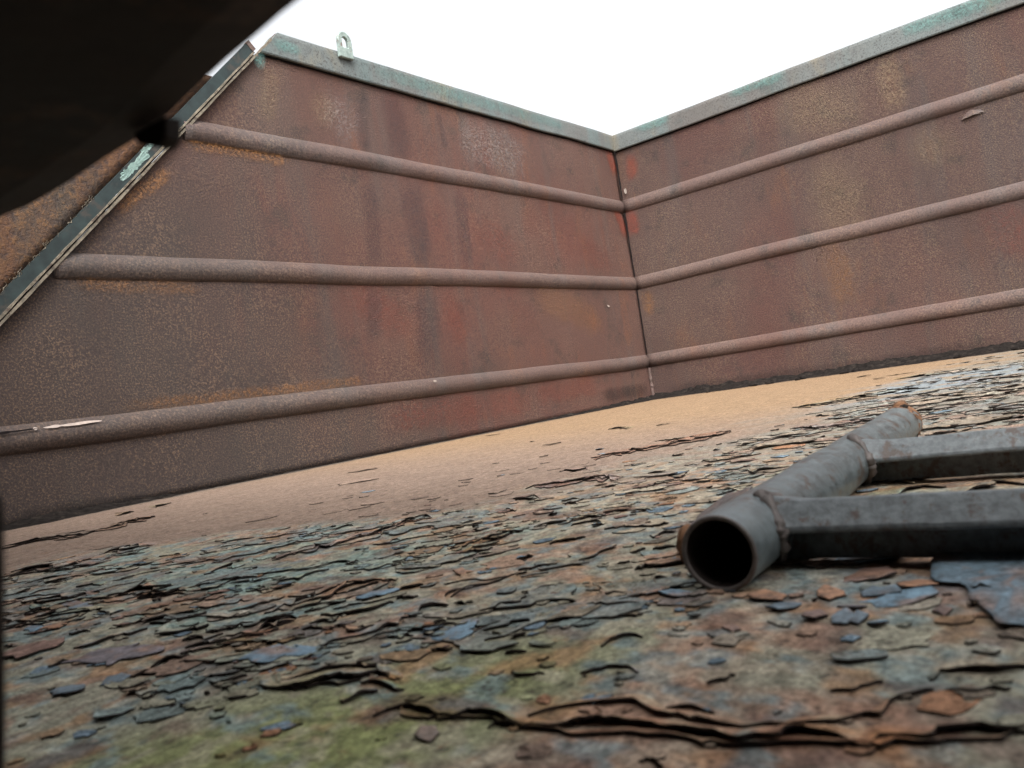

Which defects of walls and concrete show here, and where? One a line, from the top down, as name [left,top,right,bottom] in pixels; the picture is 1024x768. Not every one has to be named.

corrosion [790,372,945,430]
corrosion [917,392,1024,434]
corrosion [701,453,788,478]
corrosion [452,430,753,564]
corrosion [271,514,432,559]
corrosion [5,542,1024,748]
corrosion [638,757,664,768]